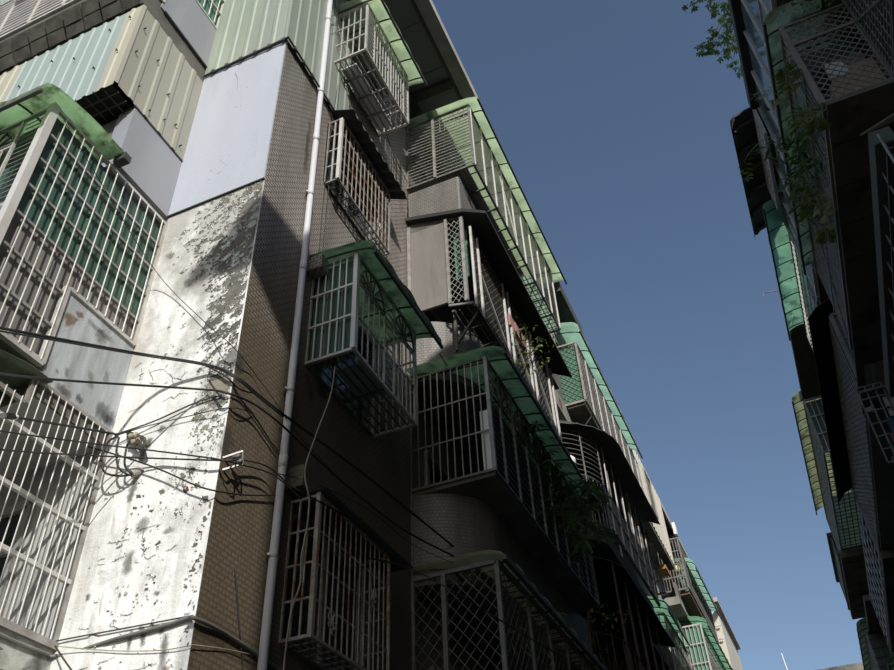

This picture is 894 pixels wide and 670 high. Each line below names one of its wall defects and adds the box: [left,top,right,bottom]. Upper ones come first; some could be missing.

peeling [90,180,263,649]